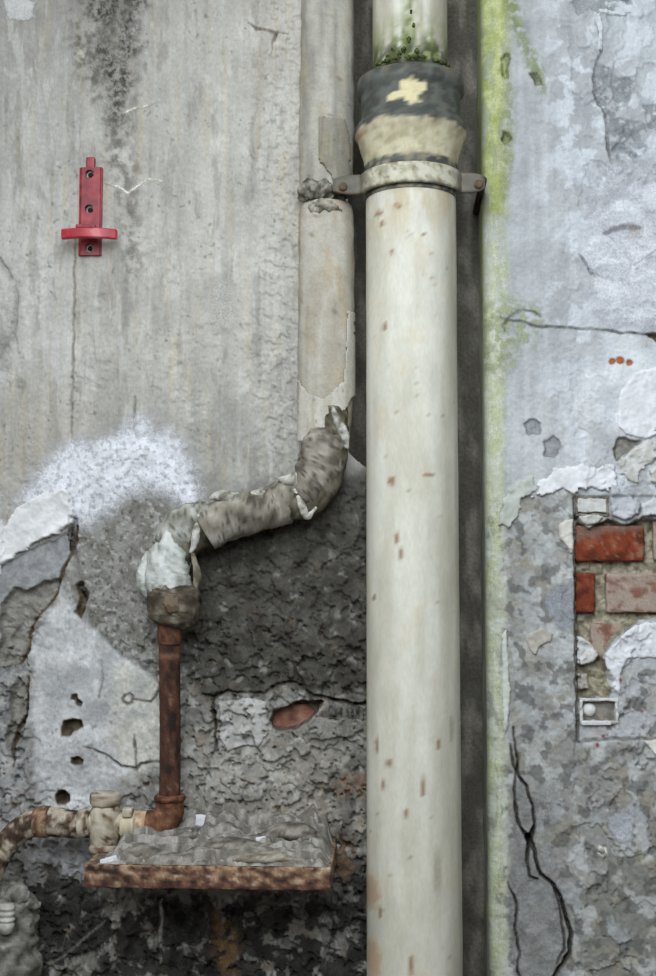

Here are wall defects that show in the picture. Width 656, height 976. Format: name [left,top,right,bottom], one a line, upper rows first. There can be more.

mould [77,0,145,122]
crack [592,31,613,162]
crack [501,309,649,336]
efflorescence [13,413,203,528]
leakage [480,0,543,976]
spalling [498,367,656,701]
spalling [0,481,180,765]
peeling [218,698,367,758]
peeling [501,630,511,737]
peeling [195,814,206,826]
crack [507,727,573,976]